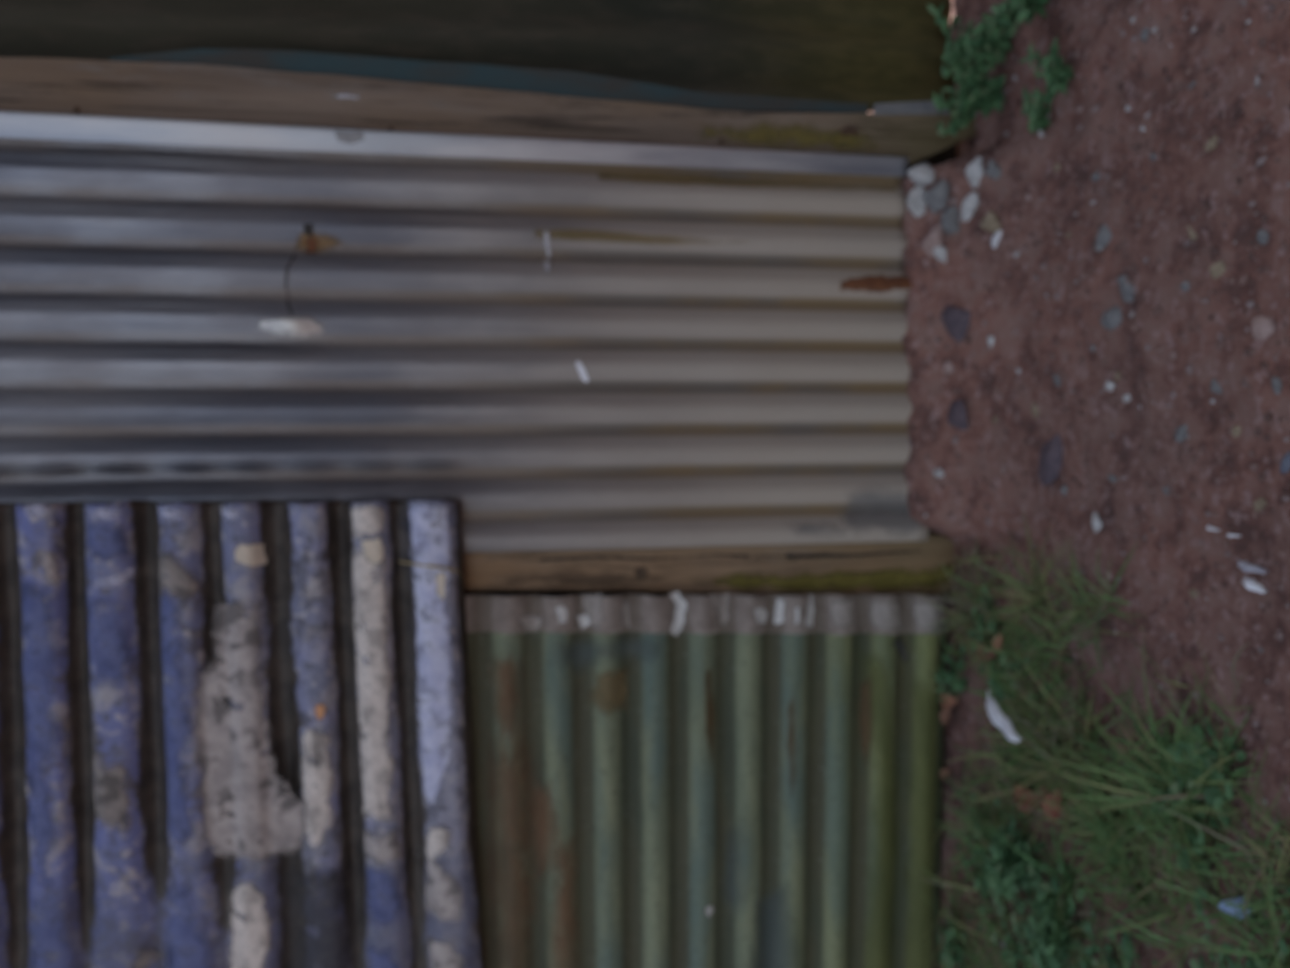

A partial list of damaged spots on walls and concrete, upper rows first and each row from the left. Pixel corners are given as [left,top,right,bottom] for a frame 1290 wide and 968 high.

rust [841,274,913,293]
peeling [194,601,334,861]
peeling [230,883,272,968]